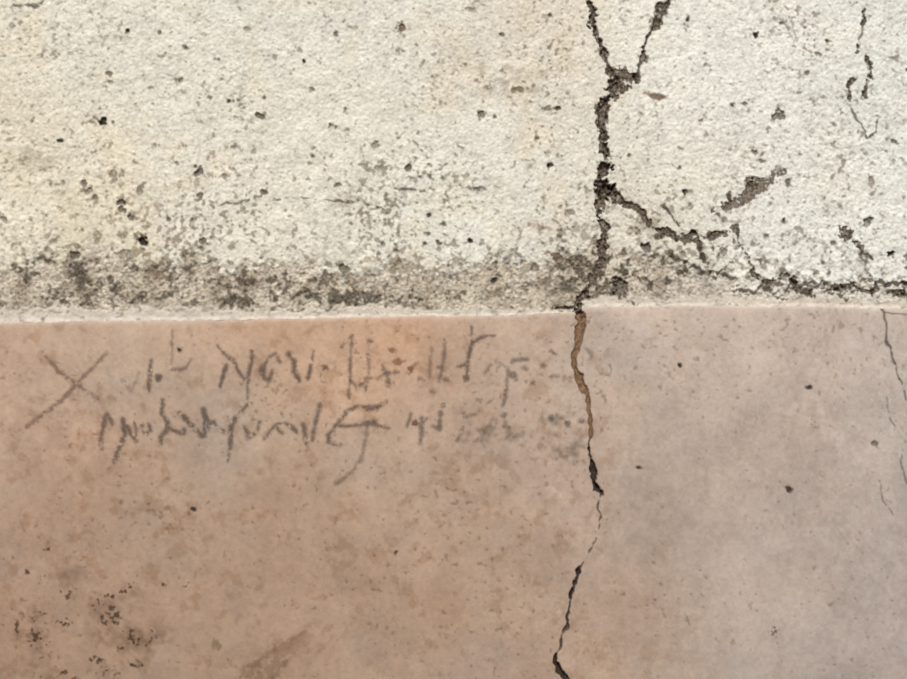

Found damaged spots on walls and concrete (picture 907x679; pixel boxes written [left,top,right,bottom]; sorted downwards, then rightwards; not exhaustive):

damp [14,256,55,283]
damp [42,255,178,306]
damp [204,267,259,308]
damp [266,270,422,307]
damp [555,260,578,293]
crack [552,0,907,520]
crack [553,549,591,679]